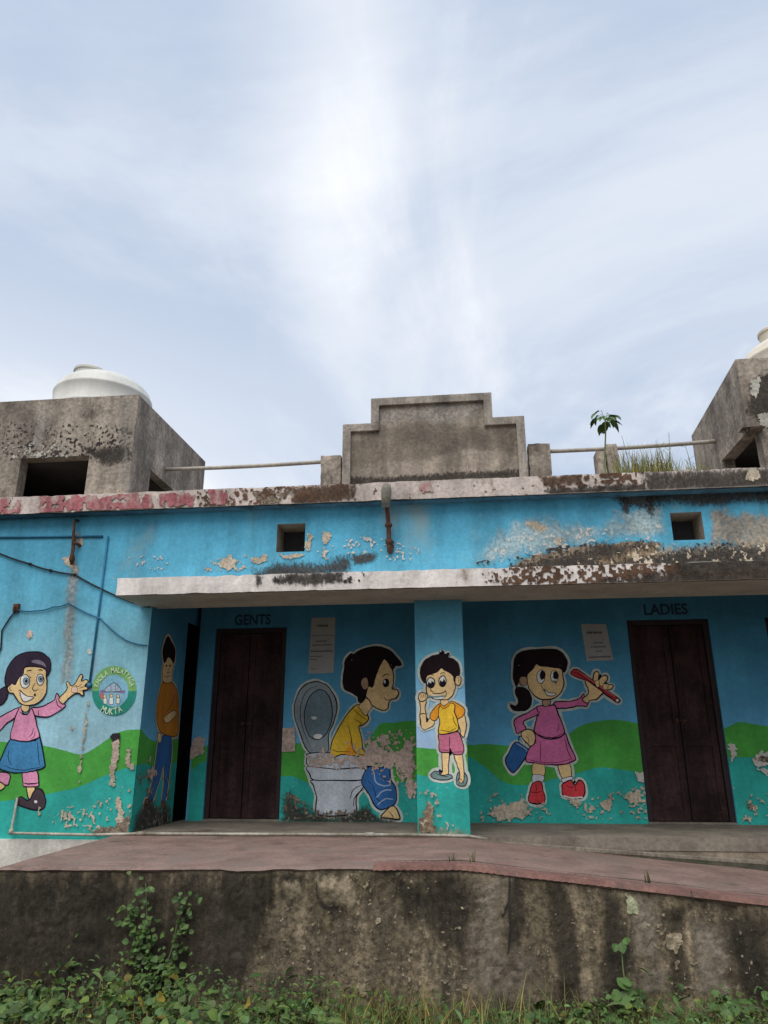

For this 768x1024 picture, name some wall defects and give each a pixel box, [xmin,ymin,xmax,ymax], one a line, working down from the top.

peeling [204,531,419,572]
spalling [476,509,768,567]